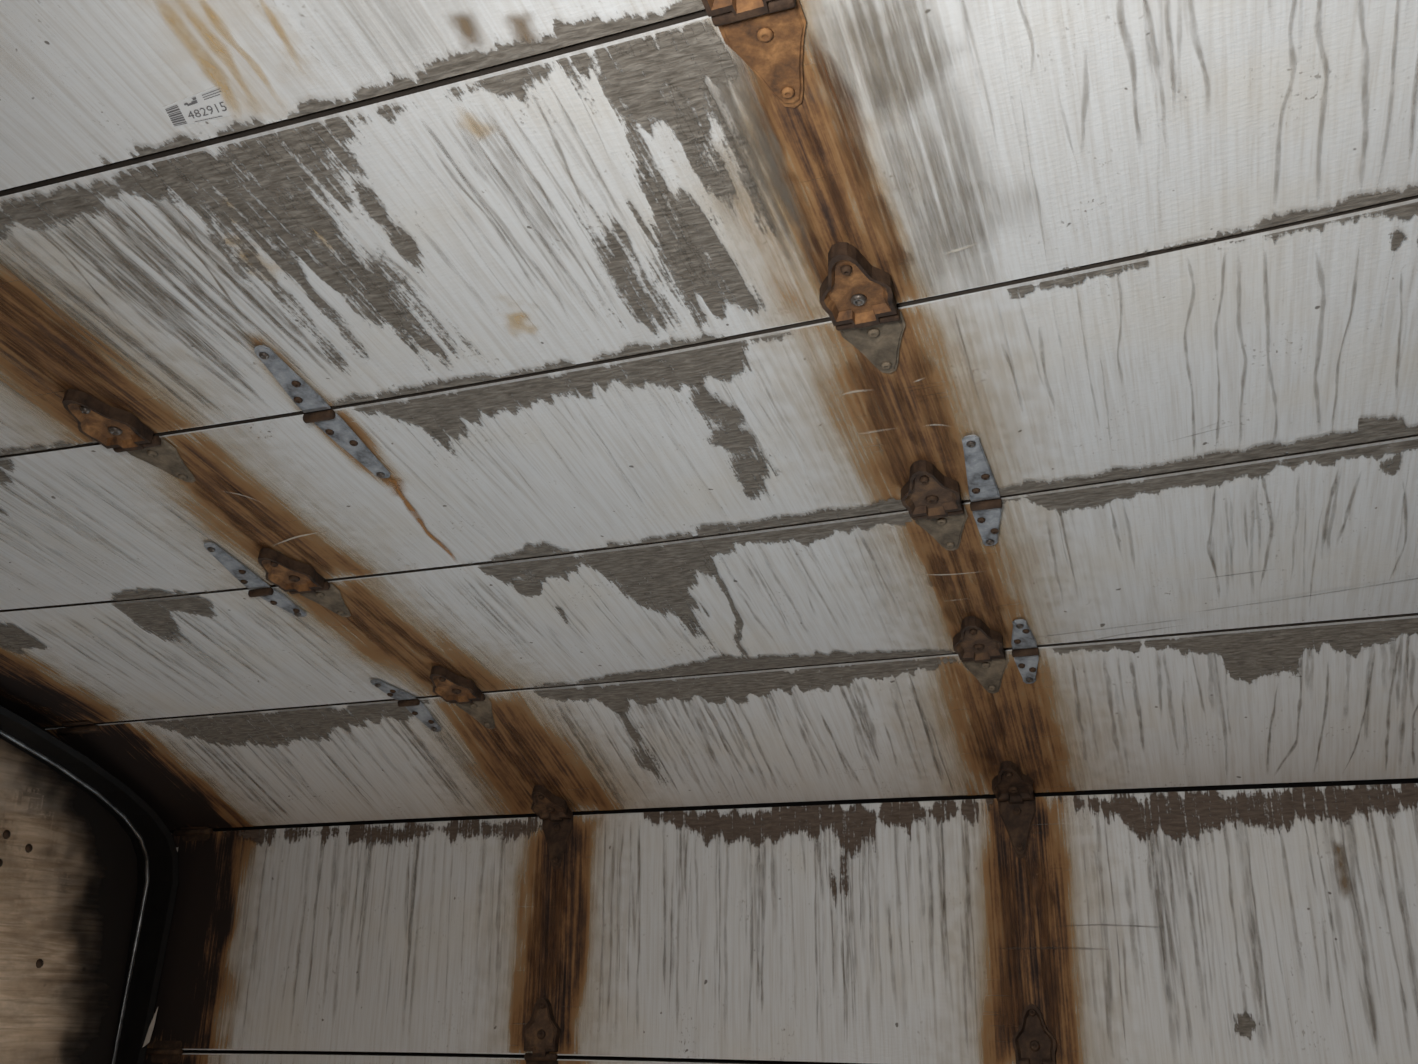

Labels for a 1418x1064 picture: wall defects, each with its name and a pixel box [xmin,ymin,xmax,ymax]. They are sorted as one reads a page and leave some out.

corrosion [0,263,622,1064]
corrosion [742,26,1084,1064]